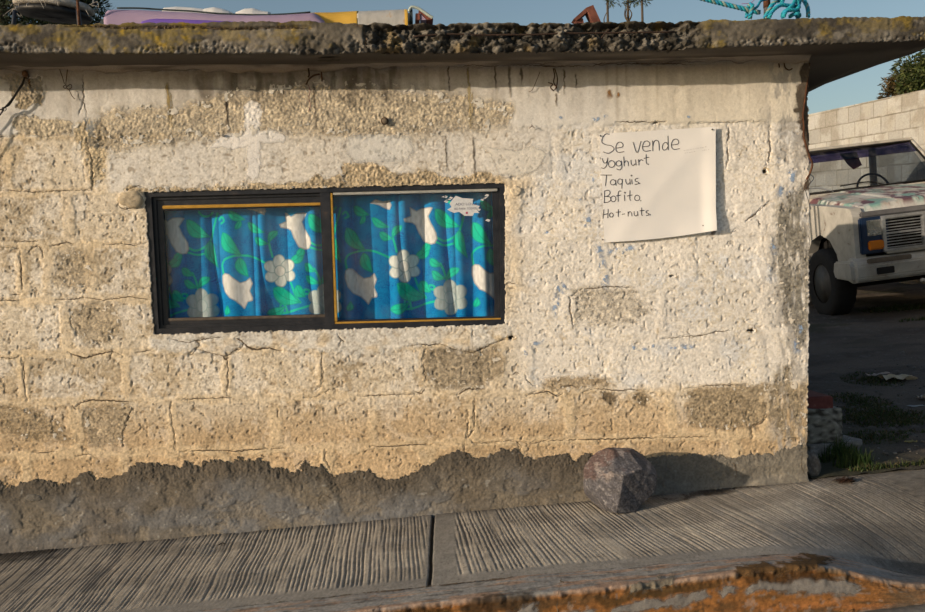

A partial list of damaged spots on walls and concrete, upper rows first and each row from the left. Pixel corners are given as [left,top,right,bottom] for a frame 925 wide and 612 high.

crack [0,240,72,301]
crack [68,350,152,360]
crack [72,399,133,441]
crack [170,336,281,452]
peeling [517,603,538,612]
peeling [611,553,861,612]